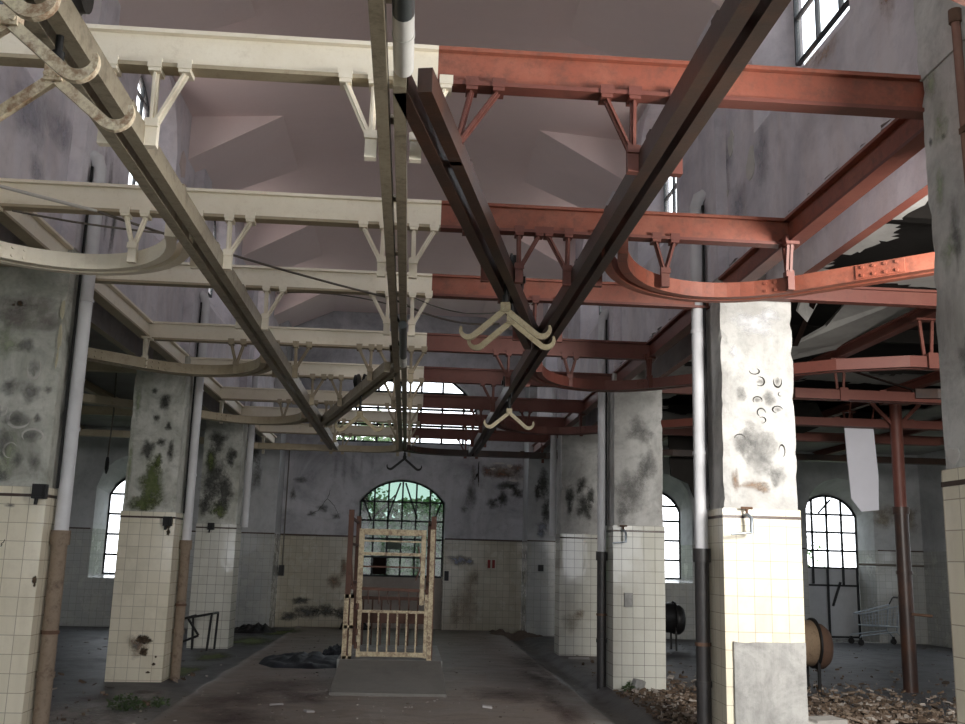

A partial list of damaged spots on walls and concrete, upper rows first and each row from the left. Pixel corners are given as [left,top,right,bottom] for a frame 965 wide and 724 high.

water stain [9,414,40,439]
water stain [142,388,173,458]
water stain [200,432,237,512]
water stain [487,482,522,507]
water stain [535,471,549,536]
water stain [566,479,594,518]
water stain [619,456,653,517]
water stain [737,434,780,486]
spalling [130,635,157,673]